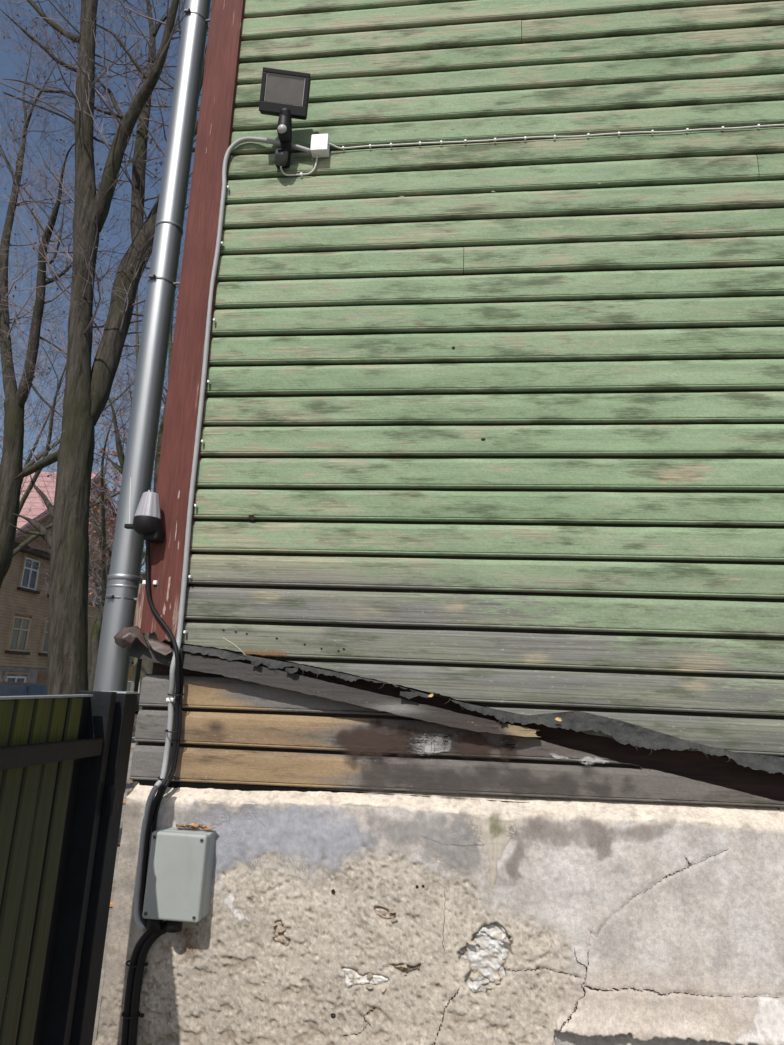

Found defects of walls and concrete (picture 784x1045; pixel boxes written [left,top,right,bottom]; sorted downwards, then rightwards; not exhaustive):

damp [336,720,610,797]
damp [372,816,520,905]
damp [532,819,609,856]
damp [626,824,667,839]
flaking render [342,963,421,992]
flaking render [459,922,514,992]
crack [510,848,779,1032]
crack [434,989,459,1044]